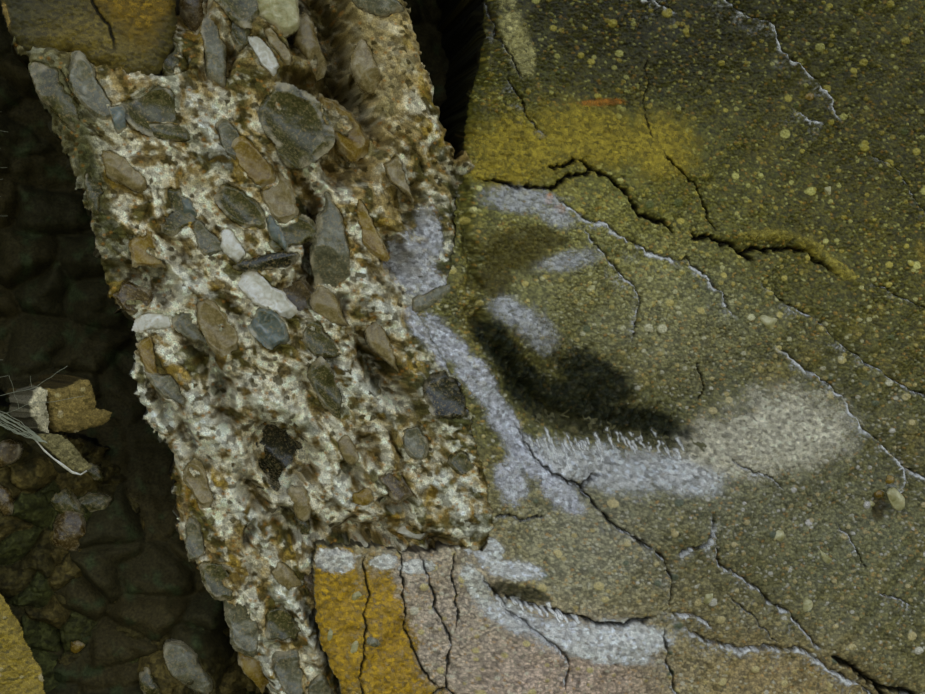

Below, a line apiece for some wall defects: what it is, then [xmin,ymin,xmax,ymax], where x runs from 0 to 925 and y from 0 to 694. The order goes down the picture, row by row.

crack [91,0,115,45]
leakage [491,188,572,225]
crack [484,159,731,332]
crack [666,158,827,269]
leakage [496,298,556,346]
leakage [406,310,853,513]
crack [397,550,459,694]
crack [497,513,542,521]
leakage [460,537,671,665]
crack [487,583,650,685]
crack [519,432,913,694]